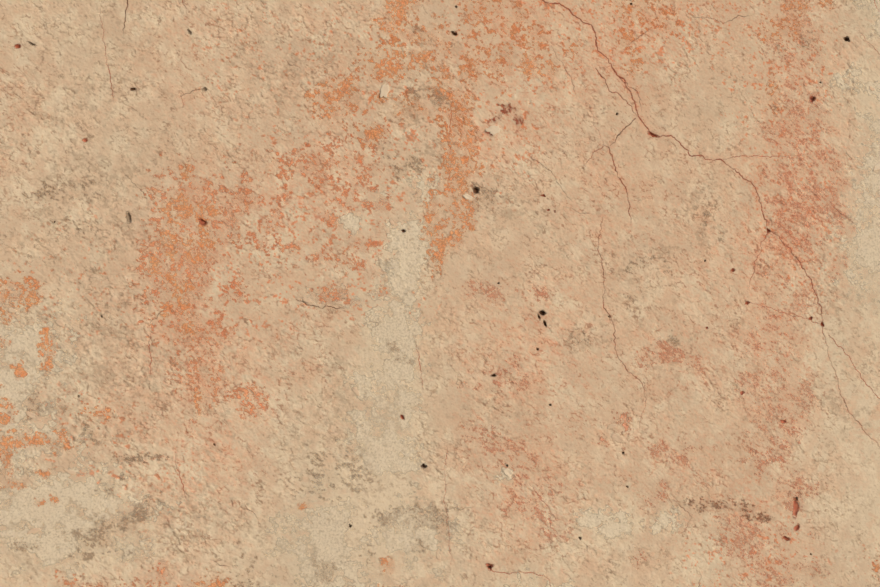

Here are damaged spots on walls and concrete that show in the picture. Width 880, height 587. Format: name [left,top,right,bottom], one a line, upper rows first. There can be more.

crack [542,0,880,399]
peeling [0,289,180,566]